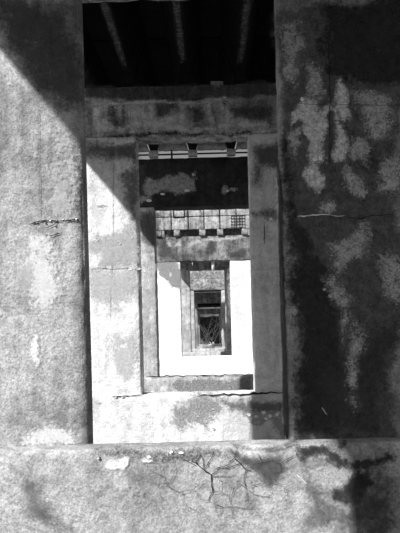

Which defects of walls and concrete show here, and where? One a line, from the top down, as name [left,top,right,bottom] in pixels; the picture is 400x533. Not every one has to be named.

water stain [0,0,277,134]
water stain [228,0,400,533]
crack [200,389,283,397]
crack [151,451,307,520]